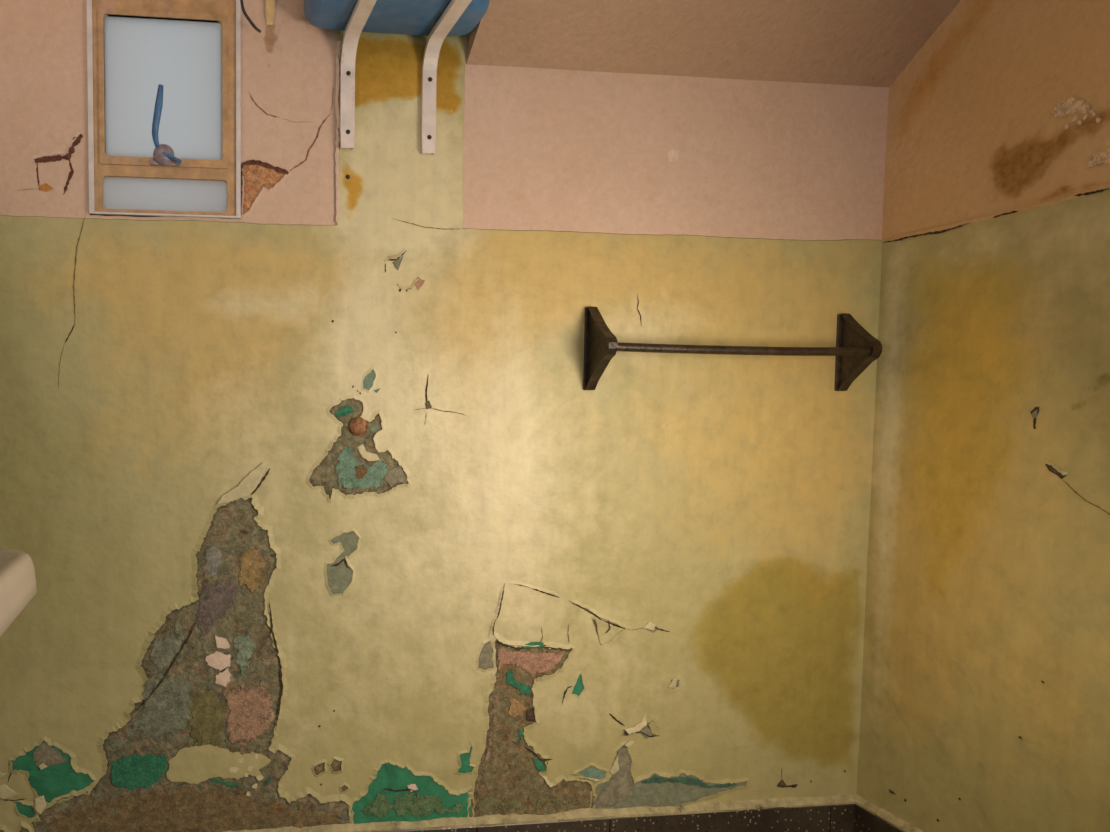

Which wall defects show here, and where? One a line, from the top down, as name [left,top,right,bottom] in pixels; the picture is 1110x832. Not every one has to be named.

crack [22,132,83,195]
crack [249,93,293,122]
crack [58,217,85,389]
peeling [305,367,412,503]
crack [415,377,466,421]
spalling [0,462,750,832]